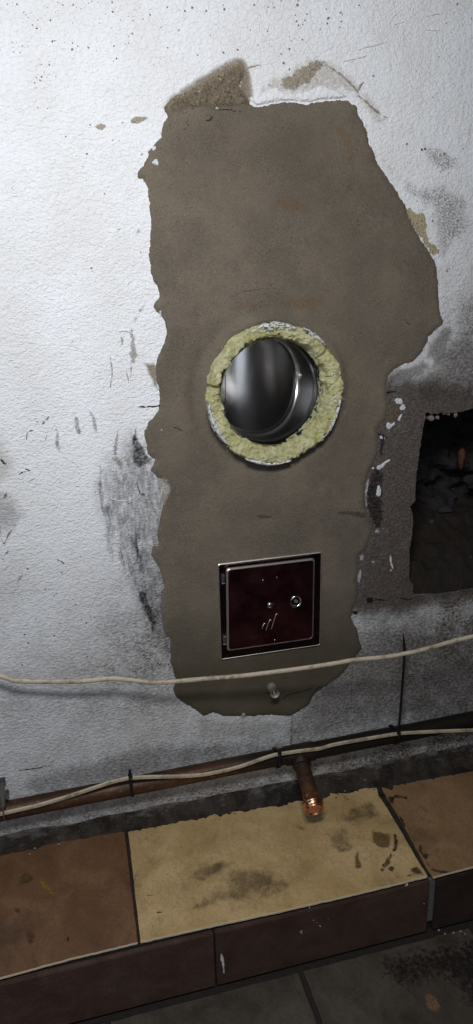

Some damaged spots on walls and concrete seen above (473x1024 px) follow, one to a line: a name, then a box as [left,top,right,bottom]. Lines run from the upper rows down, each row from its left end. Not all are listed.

spalling [172,36,387,118]
peeling [406,194,461,255]
peeling [380,398,406,439]
damp [130,435,149,464]
peeling [365,459,391,506]
spalling [415,408,473,511]